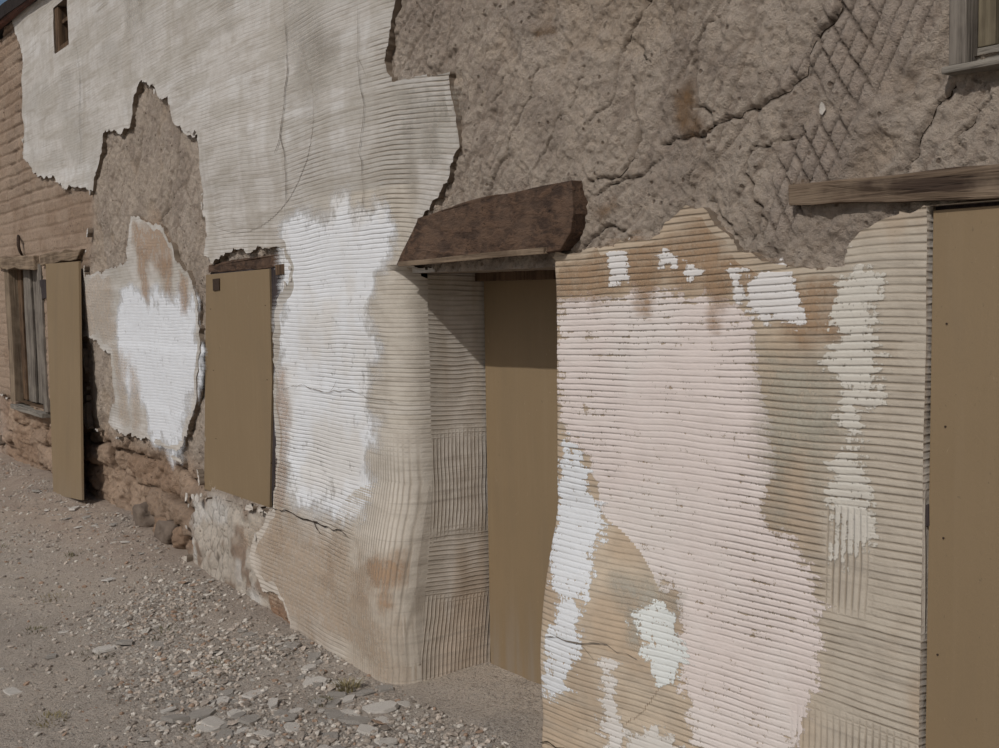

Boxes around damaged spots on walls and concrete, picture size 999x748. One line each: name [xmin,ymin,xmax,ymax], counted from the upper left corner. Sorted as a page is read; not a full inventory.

crack [667,1,843,145]
crack [908,86,957,172]
peeling [0,22,397,526]
spalling [391,0,999,748]
spalling [185,485,290,624]
crack [268,505,346,535]
crack [544,636,637,660]